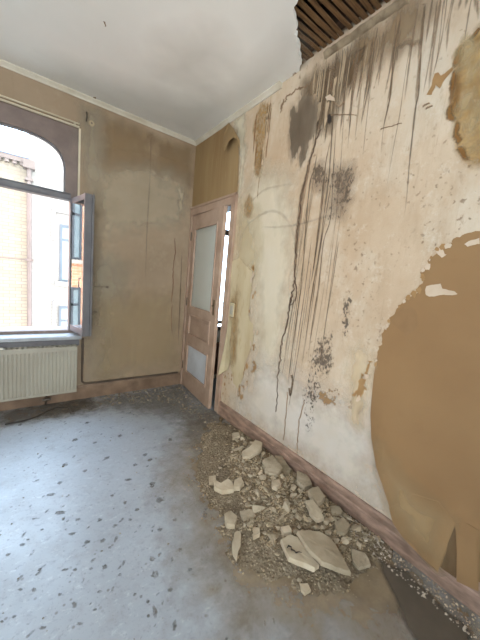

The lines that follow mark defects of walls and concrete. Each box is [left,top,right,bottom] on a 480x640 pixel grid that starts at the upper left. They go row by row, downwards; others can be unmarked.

peeling [427,67,453,95]
leakage [238,0,480,484]
peeling [398,243,457,309]
peeling [352,359,378,402]